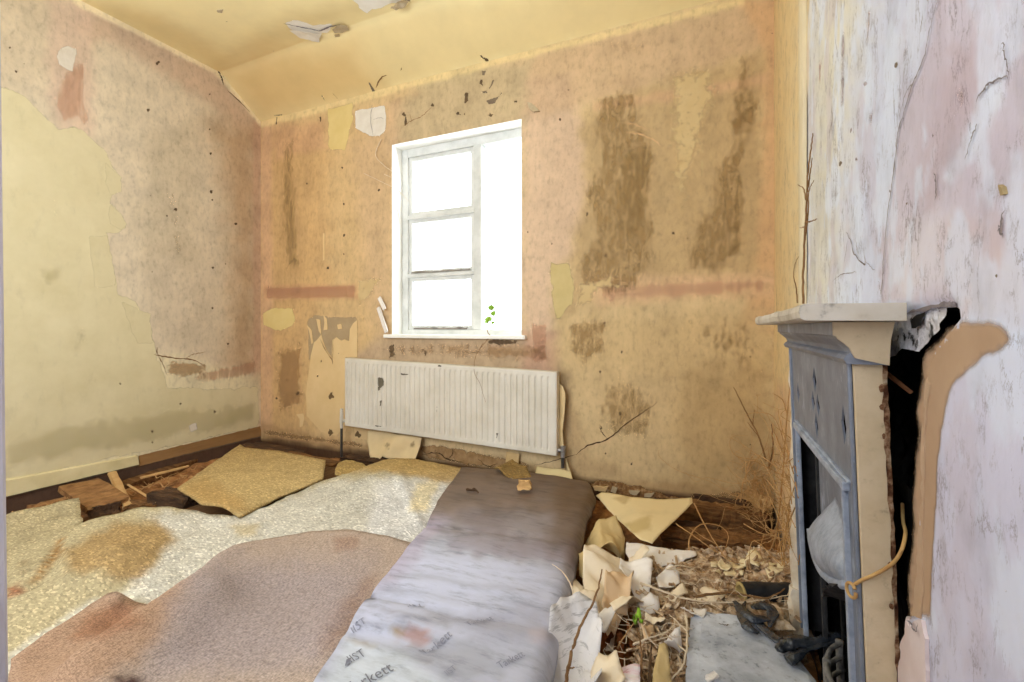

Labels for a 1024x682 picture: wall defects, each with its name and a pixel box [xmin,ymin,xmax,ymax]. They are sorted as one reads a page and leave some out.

peeling [285,20,349,42]
crack [965,43,1009,157]
damp [583,96,653,292]
damp [691,70,753,269]
peeling [1,87,259,479]
crack [154,350,204,374]
peeling [296,315,368,440]
crack [536,402,657,465]